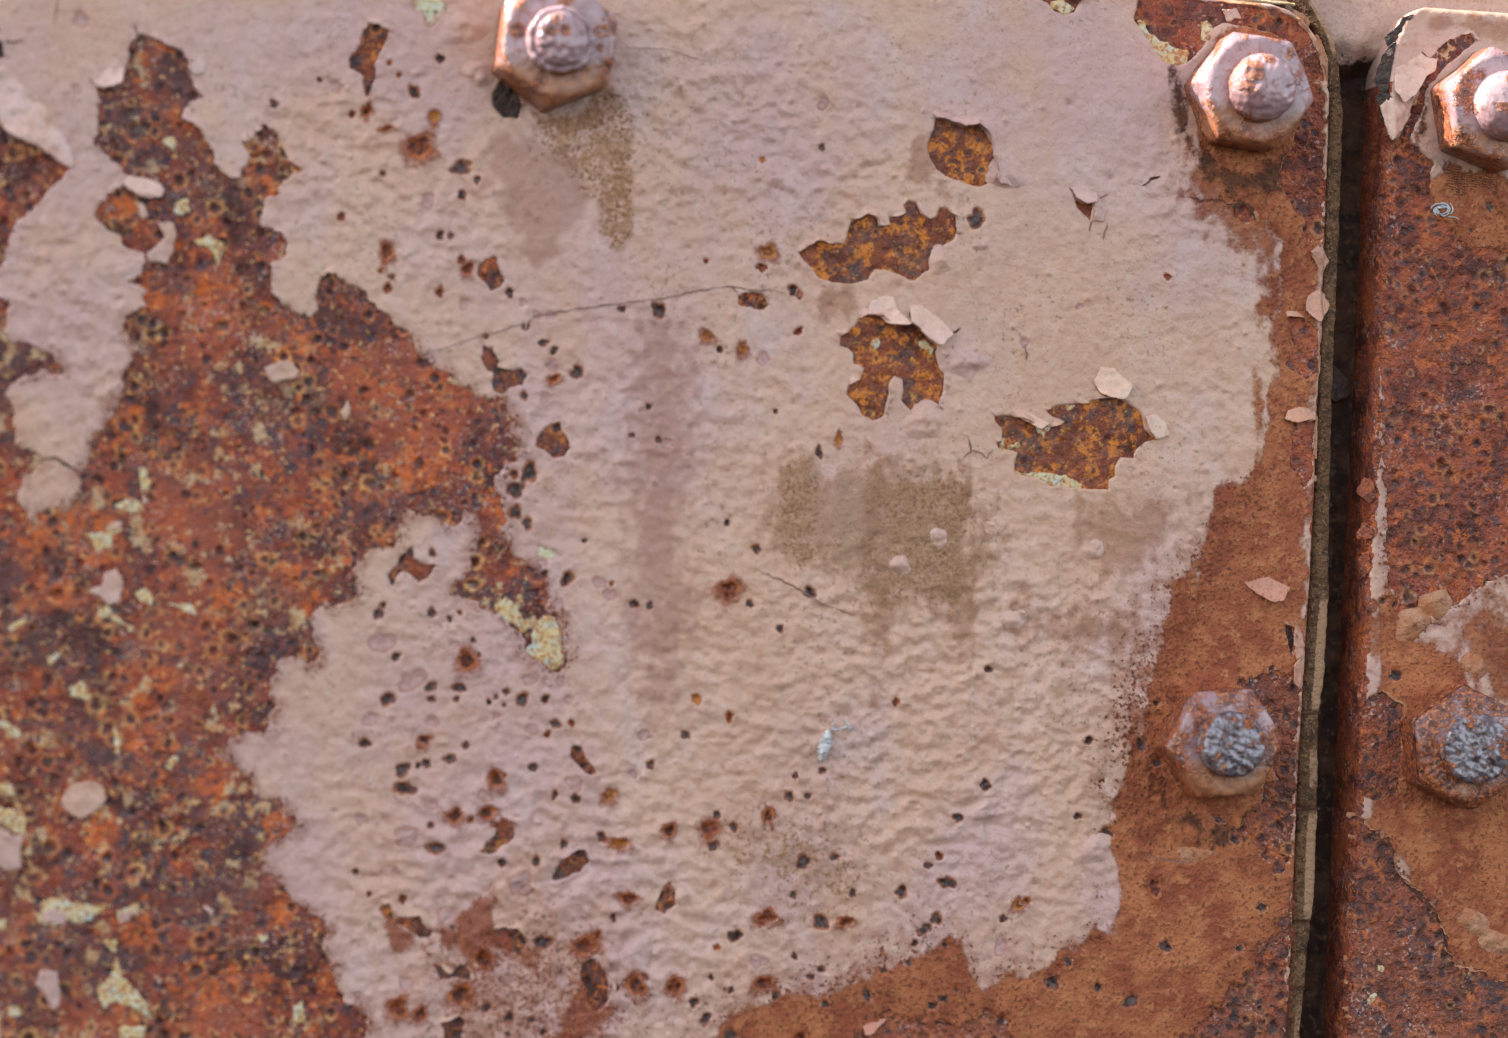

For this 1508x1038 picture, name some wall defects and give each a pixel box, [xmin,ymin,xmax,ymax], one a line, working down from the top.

crack [432,285,783,352]
peeling [755,199,986,284]
peeling [837,296,954,420]
peeling [990,367,1171,492]
peeling [1355,12,1508,613]
corrosion [1429,162,1508,254]
peeling [0,17,654,1038]
corrosion [699,65,1321,1038]
corrosion [1367,377,1508,720]
corrosion [1370,740,1508,983]
corrosion [384,884,650,1038]
peeling [385,882,712,1038]